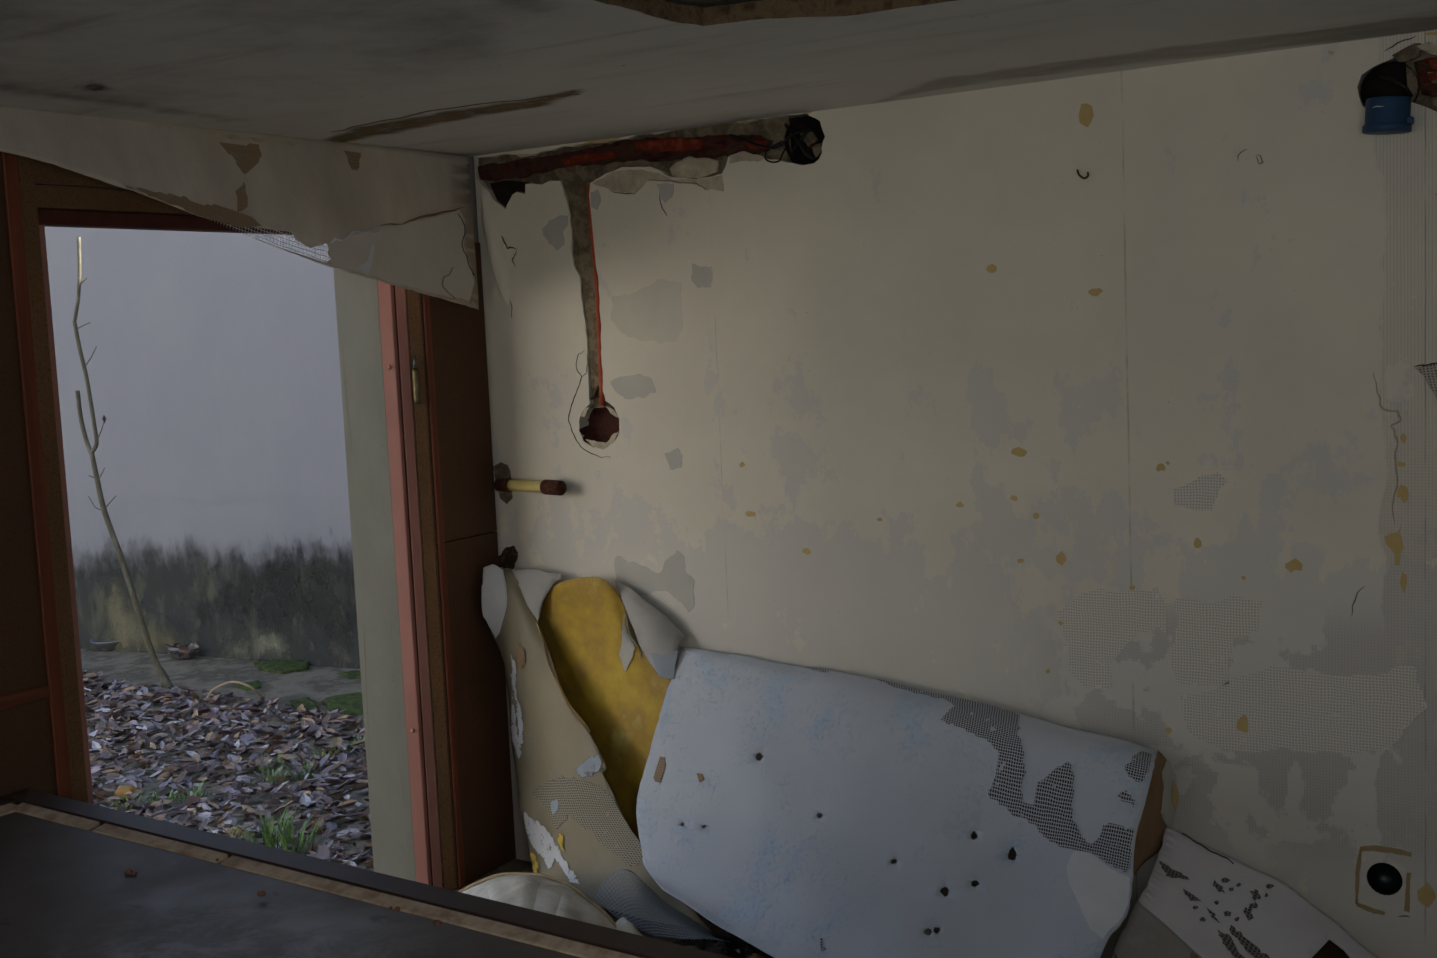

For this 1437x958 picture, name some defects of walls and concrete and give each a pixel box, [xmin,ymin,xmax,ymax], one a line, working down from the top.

flaking render [478,135,773,181]
peeling [581,374,656,449]
crack [1373,373,1402,523]
peeling [1413,363,1437,399]